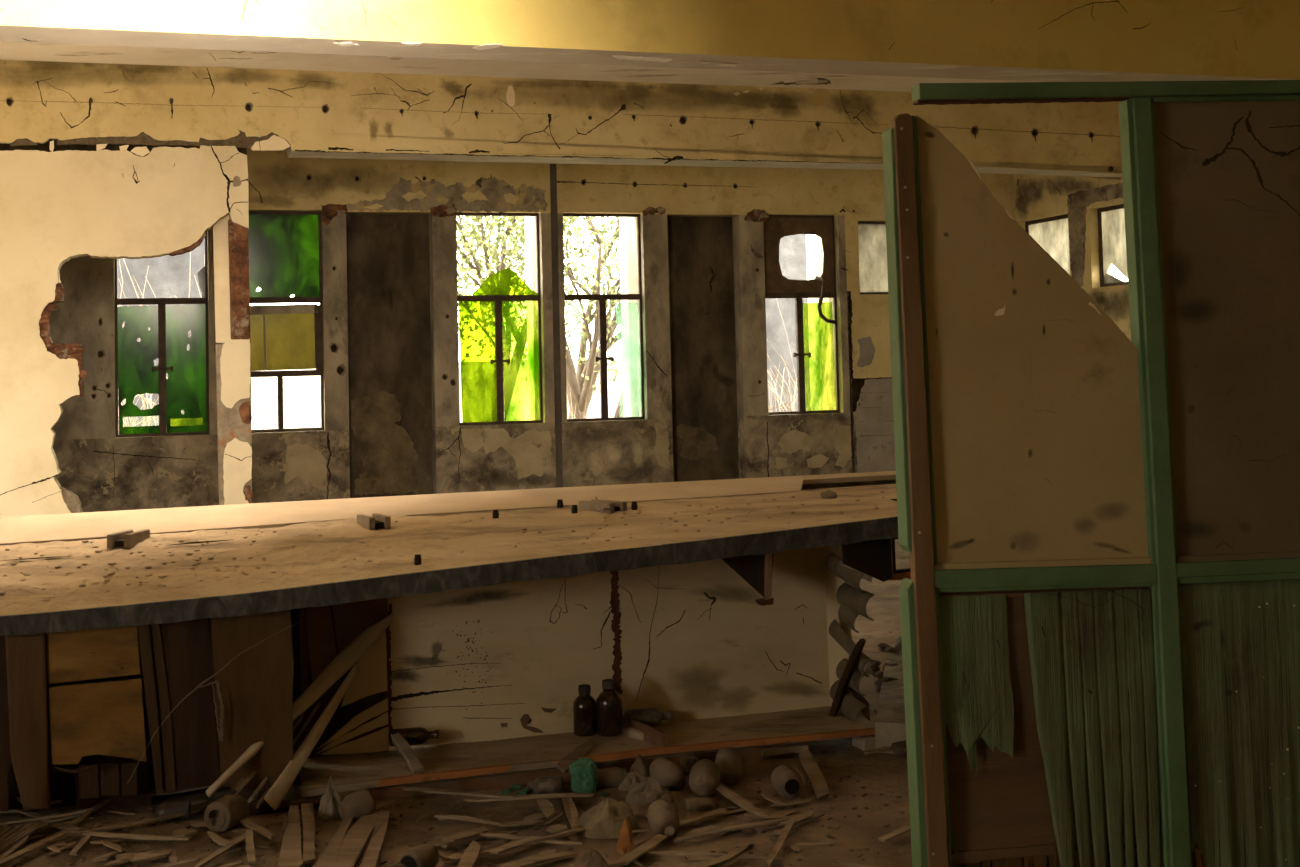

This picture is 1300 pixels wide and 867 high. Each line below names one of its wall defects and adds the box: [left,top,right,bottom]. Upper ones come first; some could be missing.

crack [0,67,326,214]
crack [490,153,748,187]
crack [623,91,885,159]
spalling [169,233,206,256]
spalling [39,283,112,399]
peeling [220,338,250,408]
crack [0,475,61,503]
spalling [60,486,83,513]
peeling [223,438,252,505]
peeling [461,427,552,480]
crack [595,567,686,702]
crack [764,650,822,684]